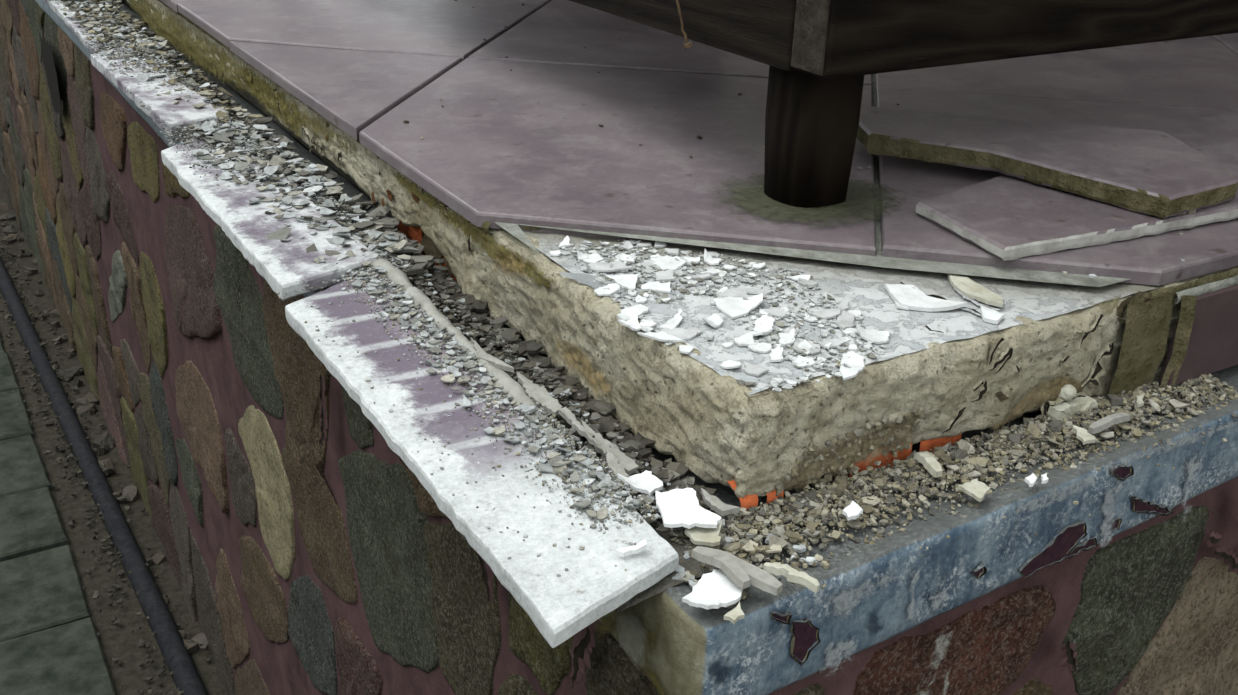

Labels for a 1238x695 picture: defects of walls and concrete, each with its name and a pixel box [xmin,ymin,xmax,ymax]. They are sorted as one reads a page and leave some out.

peeling [550,235,890,392]
crack [897,282,1020,433]
crack [1059,312,1122,389]
crack [1040,403,1048,418]
flaking render [1024,473,1049,487]
peeling [1111,462,1134,481]
peeling [1109,496,1173,531]
peeling [1019,521,1097,578]
peeling [771,611,821,666]